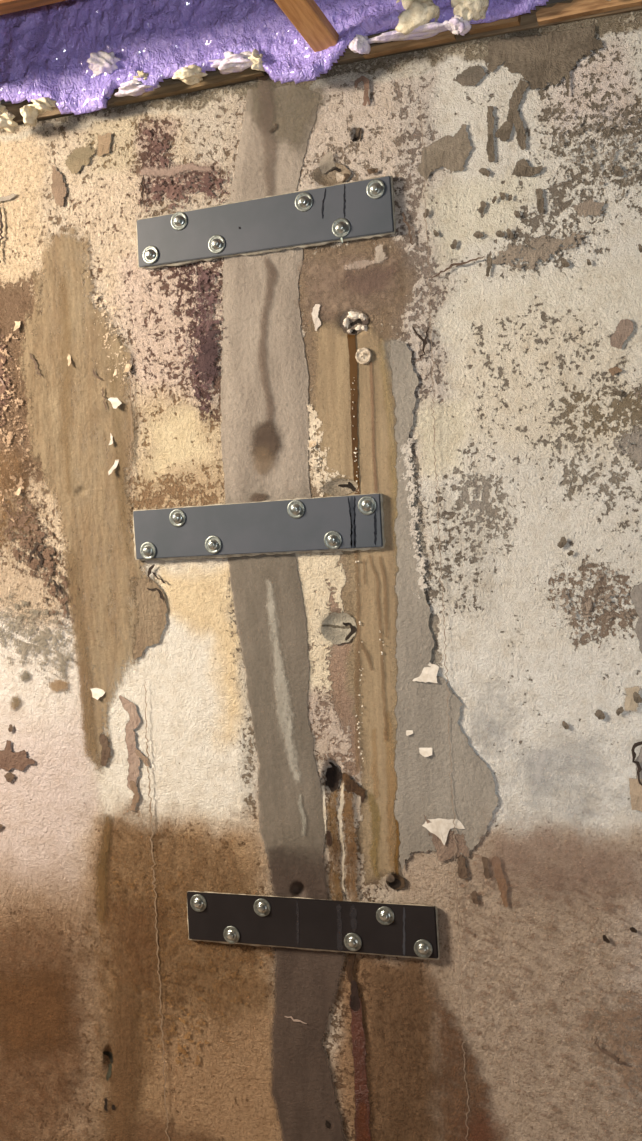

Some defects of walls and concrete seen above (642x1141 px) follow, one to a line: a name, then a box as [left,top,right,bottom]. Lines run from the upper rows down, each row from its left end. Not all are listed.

peeling [416,21,603,213]
crack [0,208,8,263]
leakage [0,227,156,769]
leakage [253,260,279,473]
rust [347,334,377,494]
peeling [91,688,105,700]
peeling [119,695,148,811]
leakage [229,554,328,900]
peeling [386,340,642,1141]
crack [631,741,642,786]
leakage [0,806,345,1141]
rust [346,953,371,1141]